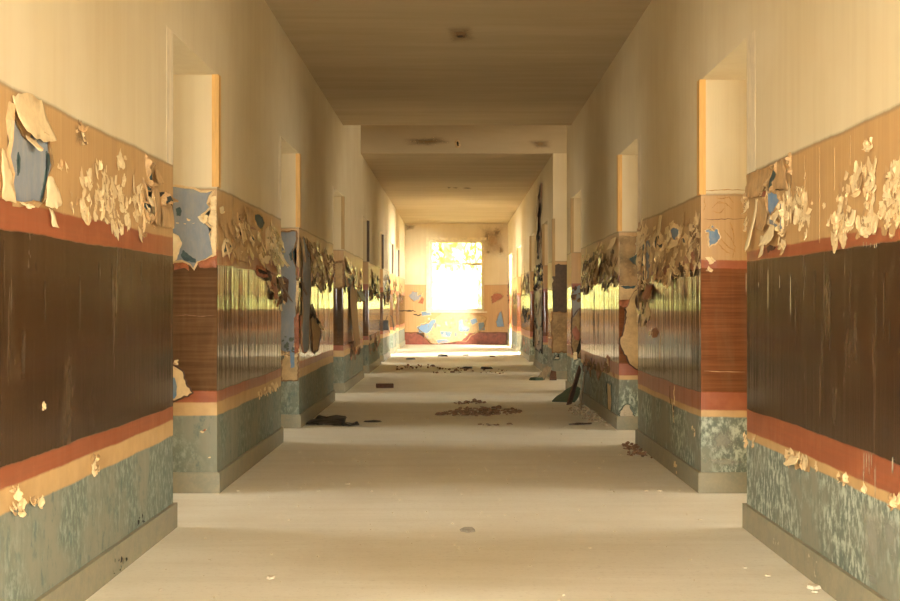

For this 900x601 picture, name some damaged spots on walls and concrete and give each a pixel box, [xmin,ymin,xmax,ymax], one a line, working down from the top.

peeling [740,137,900,258]
peeling [1,93,721,420]
peeling [783,447,818,472]
peeling [836,472,849,486]
peeling [9,484,45,517]
peeling [886,492,900,511]